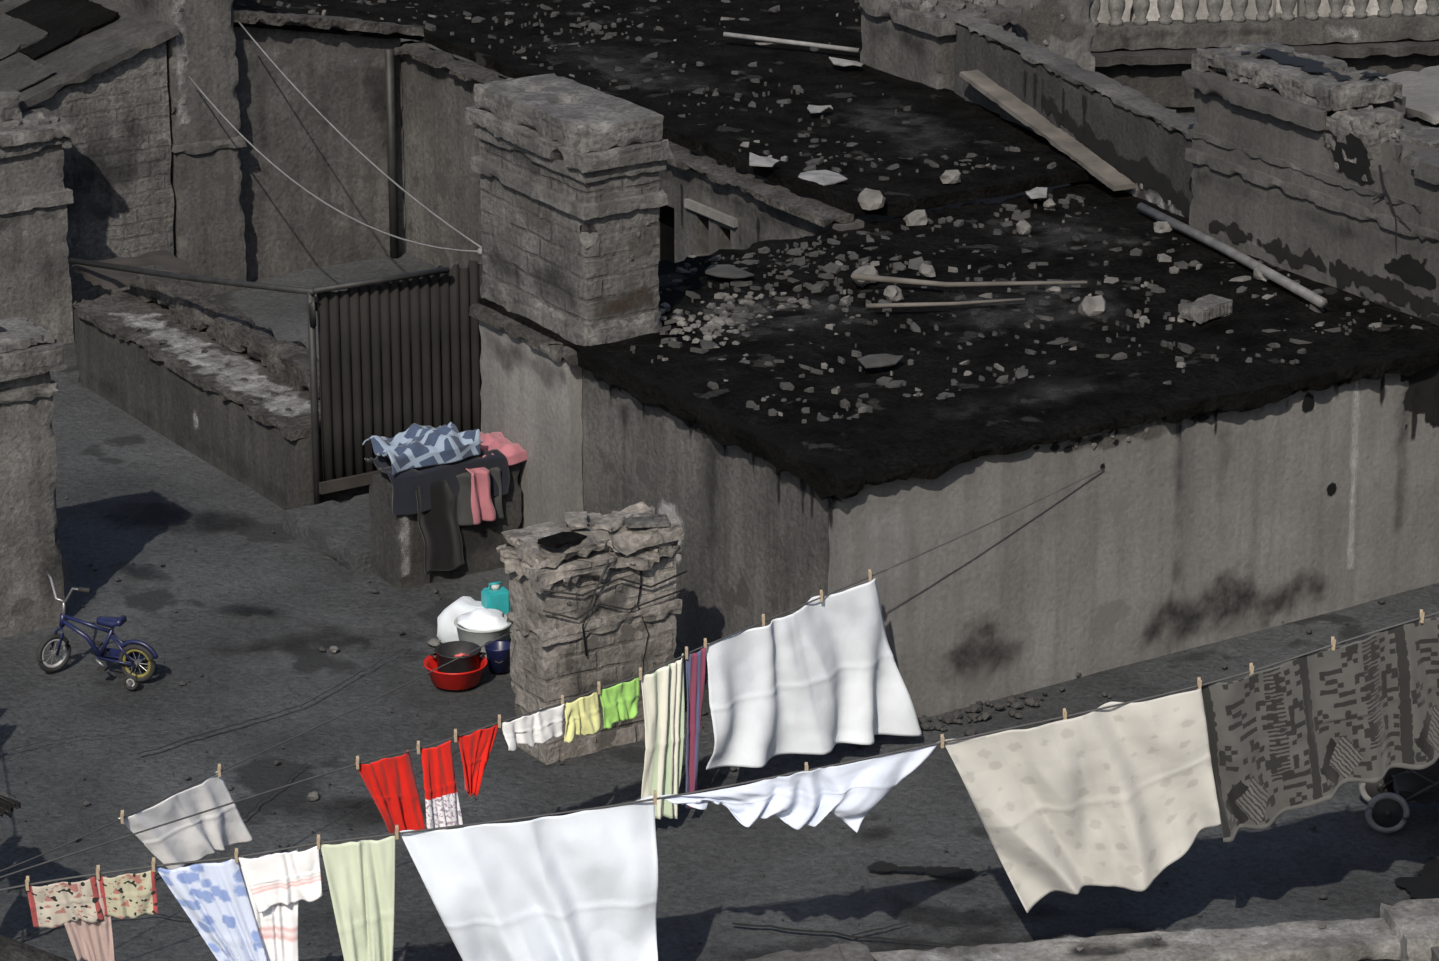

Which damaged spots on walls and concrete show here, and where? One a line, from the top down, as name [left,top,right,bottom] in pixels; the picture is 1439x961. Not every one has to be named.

peeling [1130,183,1173,212]
spalling [1325,130,1375,186]
spalling [1209,220,1439,316]
crack [622,570,649,672]